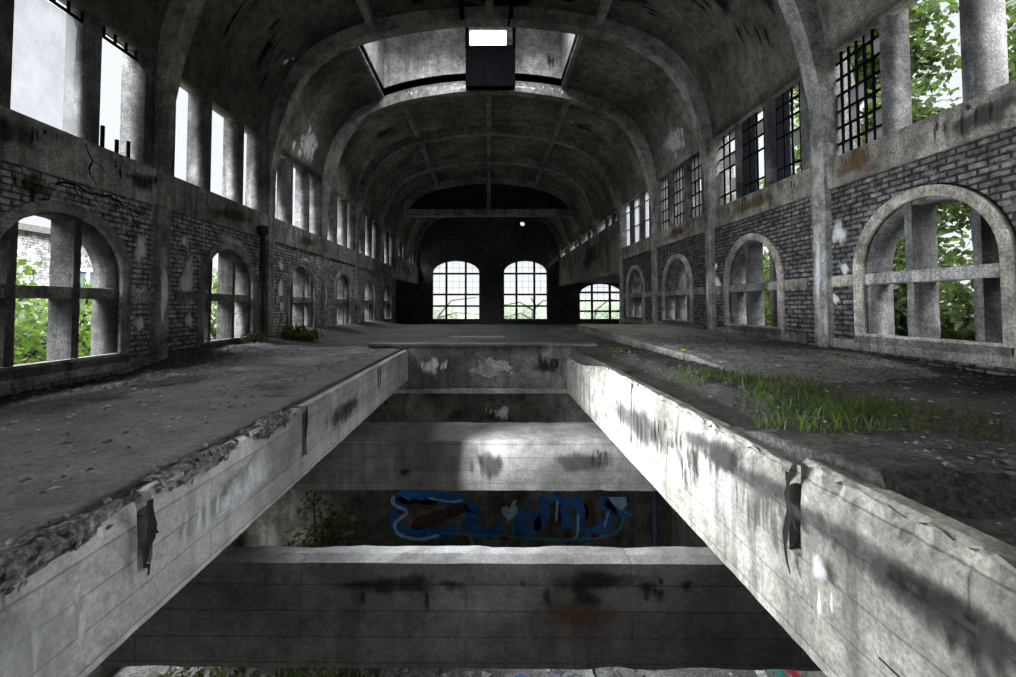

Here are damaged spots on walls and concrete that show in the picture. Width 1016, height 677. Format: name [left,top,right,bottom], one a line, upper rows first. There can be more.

water stain [470,454,500,478]
water stain [558,451,608,471]
spalling [0,405,297,595]
crack [141,499,159,576]
water stain [597,388,1016,677]
water stain [344,575,429,608]
water stain [562,572,633,605]